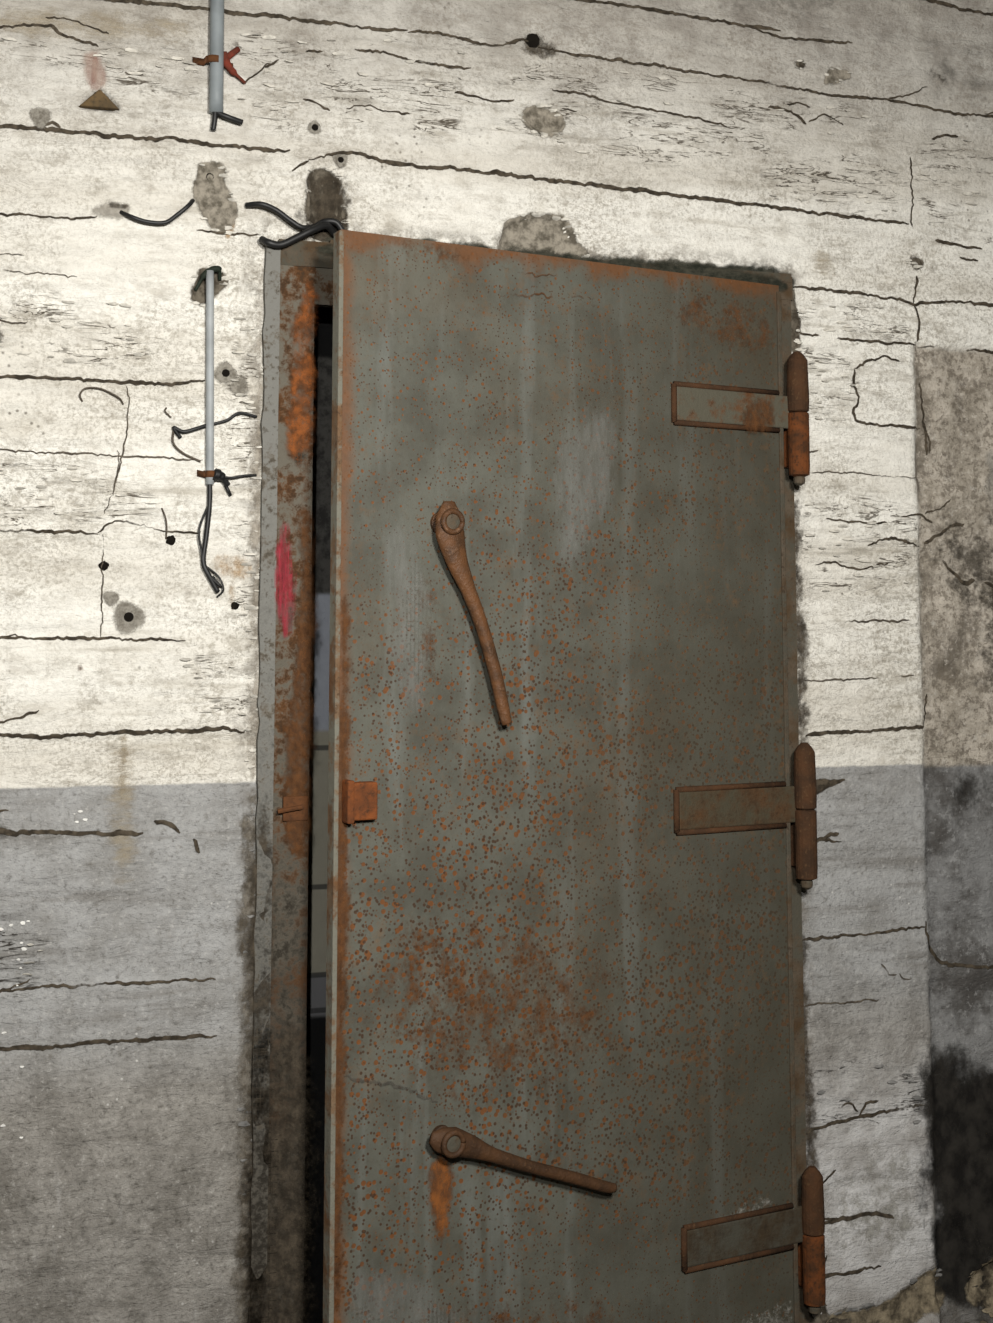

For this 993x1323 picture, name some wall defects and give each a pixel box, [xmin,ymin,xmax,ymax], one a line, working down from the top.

spalling [193,161,238,235]
crack [0,0,993,480]
spalling [498,211,590,258]
crack [0,374,205,642]
corrosion [284,508,318,800]
crack [0,710,245,740]
corrosion [334,695,351,1289]
crack [0,1033,217,1051]
corrosion [429,1158,452,1234]
water stain [920,1048,993,1309]
spalling [809,1267,945,1323]
spalling [965,1259,993,1317]